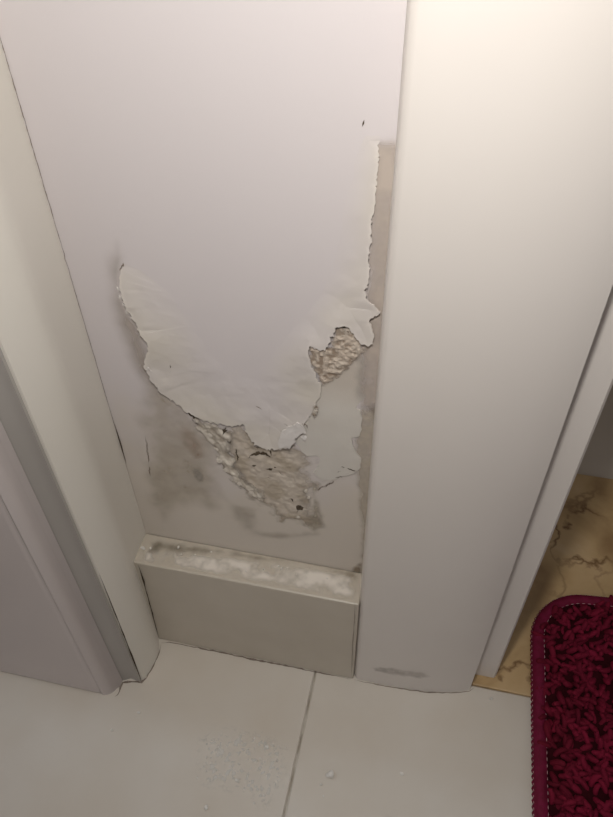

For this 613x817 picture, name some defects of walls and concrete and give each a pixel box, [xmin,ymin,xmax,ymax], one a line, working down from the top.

peeling [117,135,380,526]